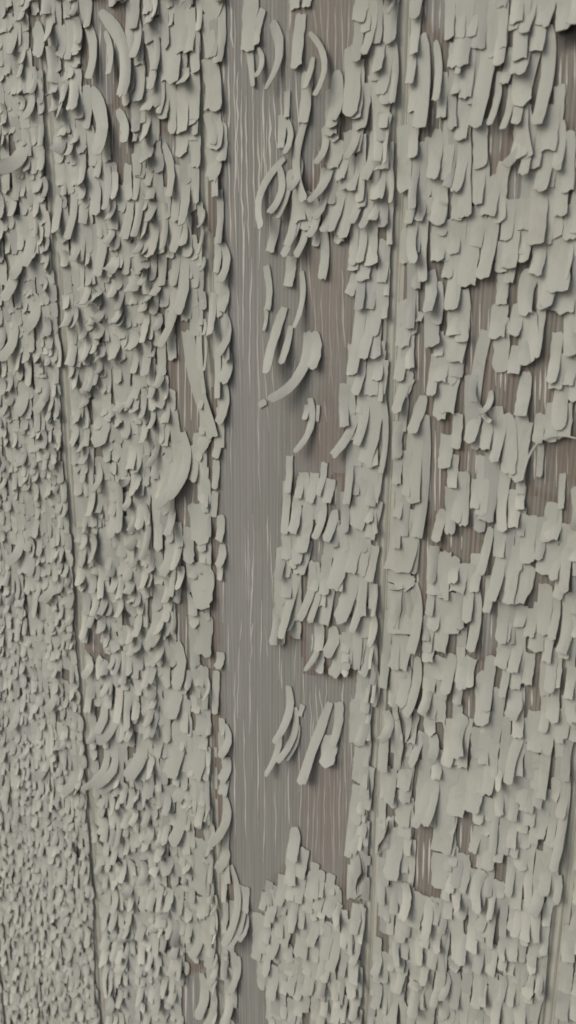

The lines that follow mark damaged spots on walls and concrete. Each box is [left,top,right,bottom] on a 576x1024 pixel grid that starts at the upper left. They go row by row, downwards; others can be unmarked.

peeling [0,0,233,1024]
peeling [210,0,576,1024]